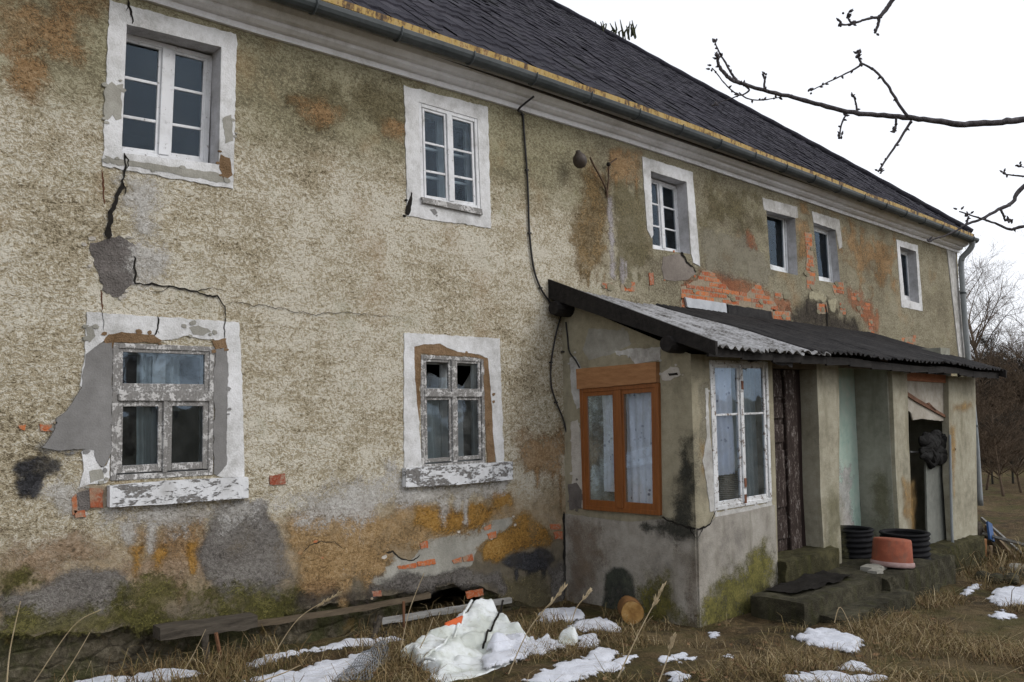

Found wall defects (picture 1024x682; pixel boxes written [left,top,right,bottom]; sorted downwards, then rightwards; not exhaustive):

flaking render [82,235,142,300]
crack [101,153,129,238]
flaking render [82,324,162,348]
peeling [181,320,229,353]
crack [133,256,400,338]
damp [570,163,652,287]
flaking render [680,270,791,321]
flaking render [803,232,875,333]
flaking render [414,344,496,463]
damp [15,474,84,512]
damp [639,436,699,540]
flaking render [285,491,563,606]